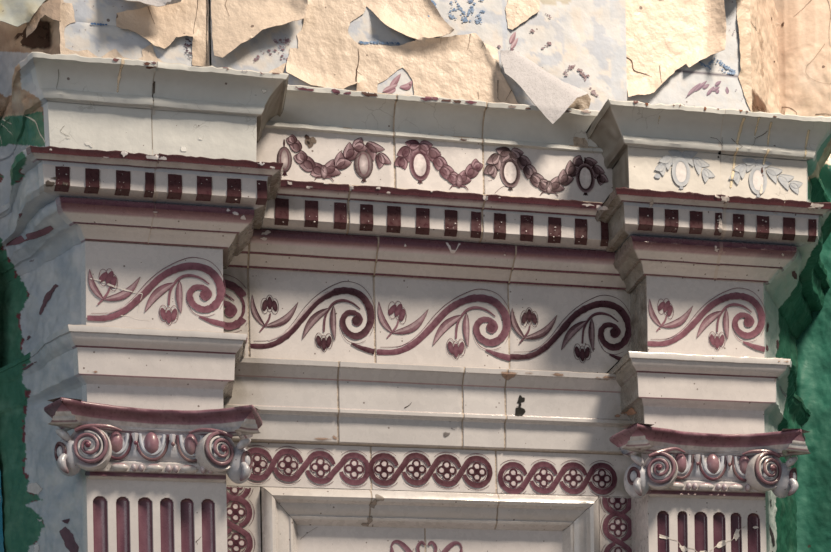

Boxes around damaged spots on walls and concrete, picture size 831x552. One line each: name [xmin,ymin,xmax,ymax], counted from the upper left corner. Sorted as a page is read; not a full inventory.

peeling [505,0,540,30]
peeling [59,0,530,109]
peeling [626,0,726,97]
peeling [6,226,53,246]
peeling [39,284,58,315]
spalling [515,395,525,416]
peeling [27,483,43,494]
peeling [59,519,79,552]